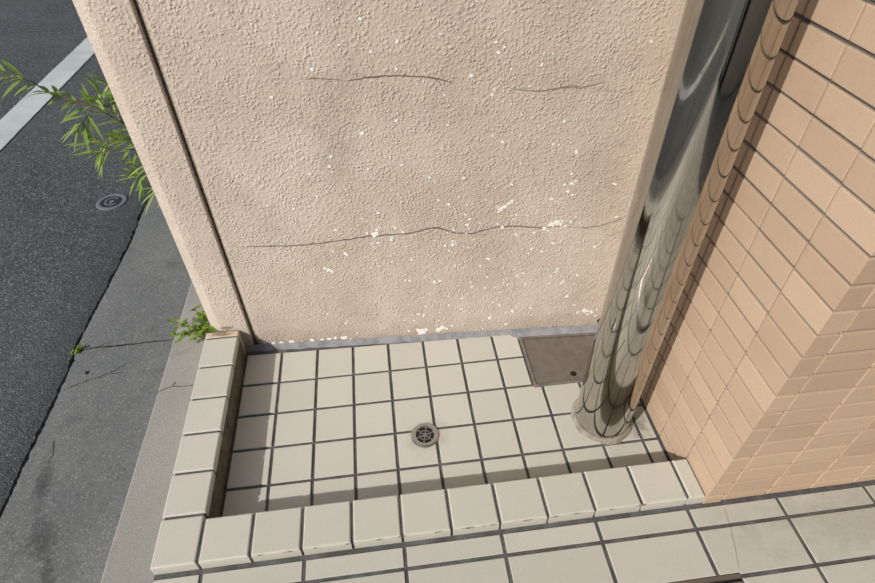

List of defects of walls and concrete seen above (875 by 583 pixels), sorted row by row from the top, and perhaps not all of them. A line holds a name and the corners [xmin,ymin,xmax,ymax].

crack [309,75,452,83]
crack [514,81,607,92]
crack [240,217,625,247]
crack [69,339,174,388]